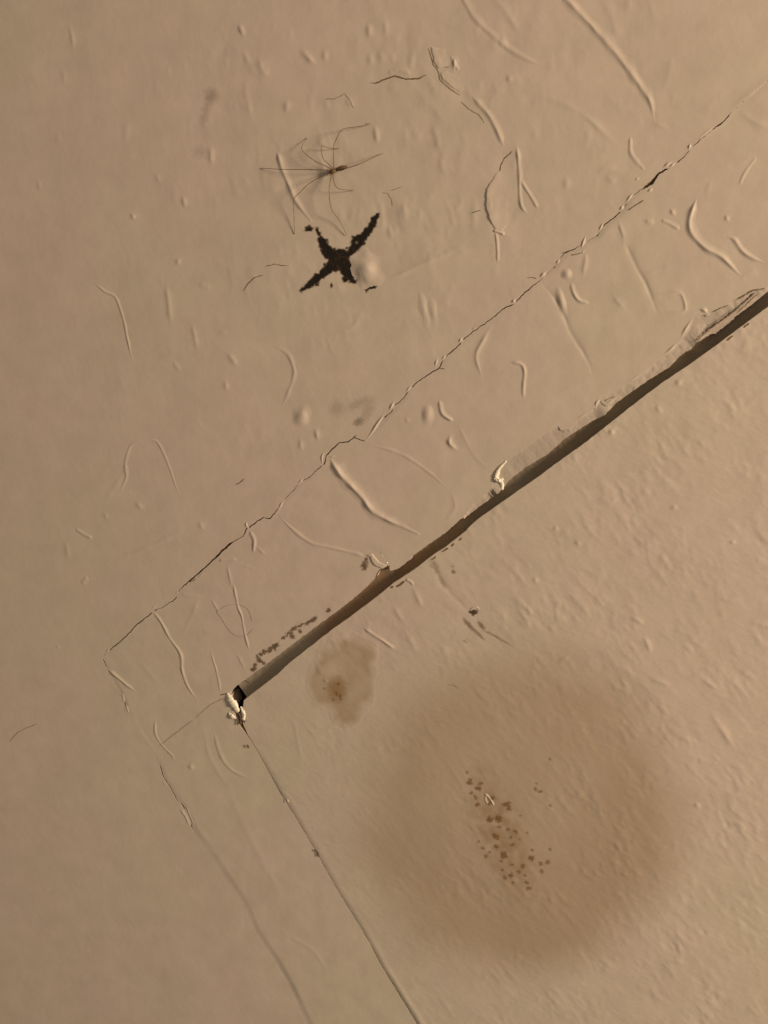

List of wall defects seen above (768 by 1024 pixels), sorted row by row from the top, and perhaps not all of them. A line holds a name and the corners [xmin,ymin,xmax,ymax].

crack [104,114,730,713]
flaking render [463,287,768,519]
crack [160,698,223,828]
damp [305,614,713,999]